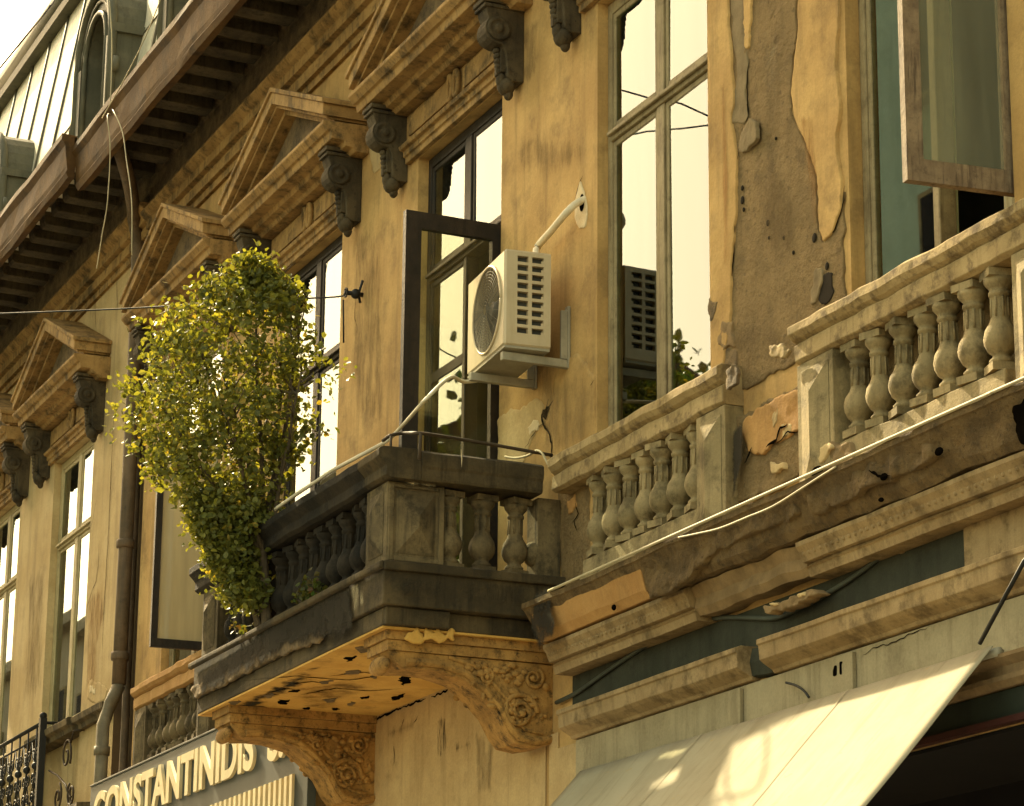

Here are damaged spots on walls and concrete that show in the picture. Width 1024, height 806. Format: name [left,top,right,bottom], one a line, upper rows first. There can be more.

peeling [707,0,847,390]
peeling [497,398,544,462]
crack [526,401,553,454]
flaking render [736,385,799,502]
spalling [191,632,411,711]
peeling [404,627,455,644]